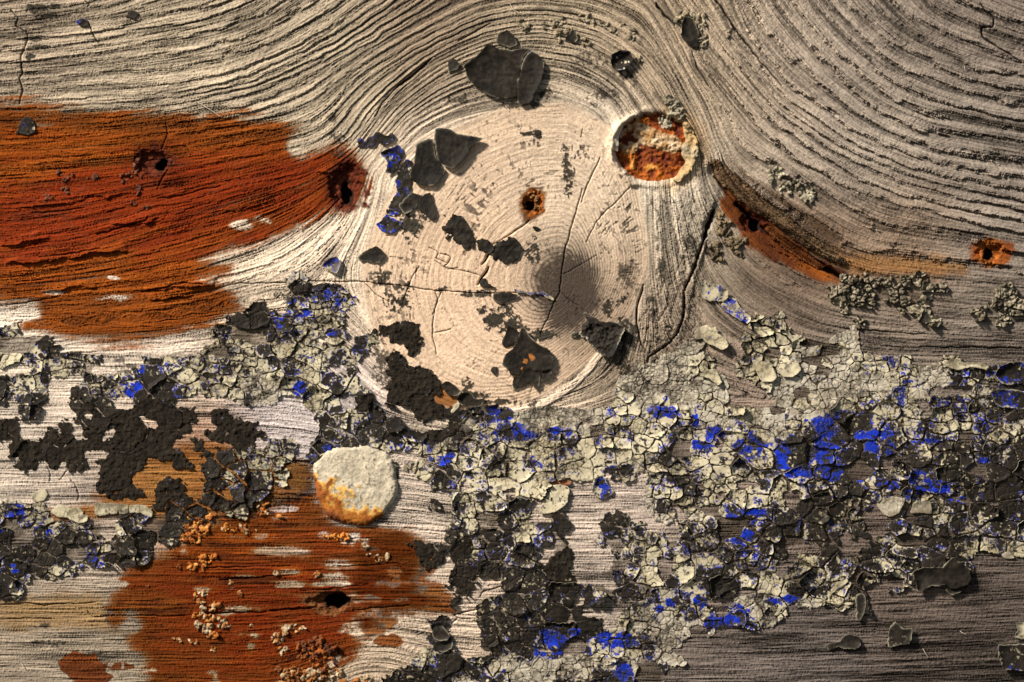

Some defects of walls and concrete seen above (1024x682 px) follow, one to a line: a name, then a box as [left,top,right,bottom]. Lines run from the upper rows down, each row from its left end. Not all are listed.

peeling [448,30,544,105]
corrosion [0,95,373,350]
peeling [357,128,522,264]
corrosion [520,188,545,222]
crack [541,161,627,332]
corrosion [718,187,1014,283]
peeling [0,257,1024,682]
corrosion [0,442,456,682]